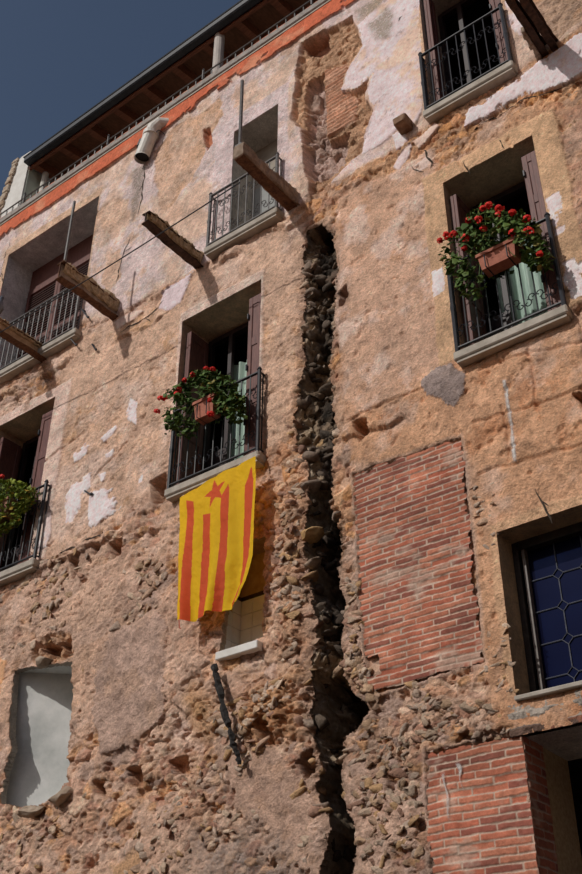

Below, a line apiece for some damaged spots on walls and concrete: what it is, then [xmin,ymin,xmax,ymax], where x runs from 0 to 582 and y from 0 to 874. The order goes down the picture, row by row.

spalling [289,0,440,196]
peeling [464,0,582,126]
crack [285,224,370,874]